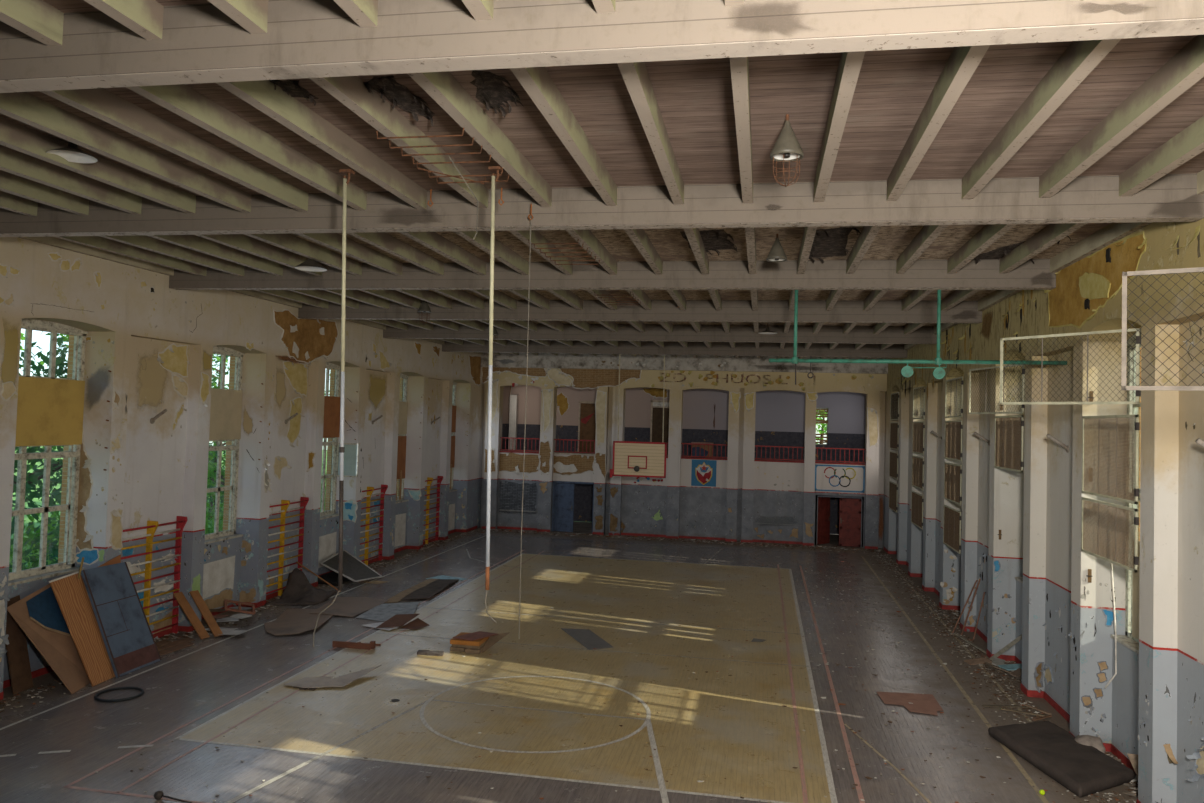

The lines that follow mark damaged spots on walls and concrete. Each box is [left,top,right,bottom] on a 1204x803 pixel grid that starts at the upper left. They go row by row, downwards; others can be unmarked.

flaking render [263,309,339,493]
flaking render [469,355,818,534]
flaking render [1034,578,1117,693]
peeling [1081,661,1108,737]
peeling [1167,737,1204,782]